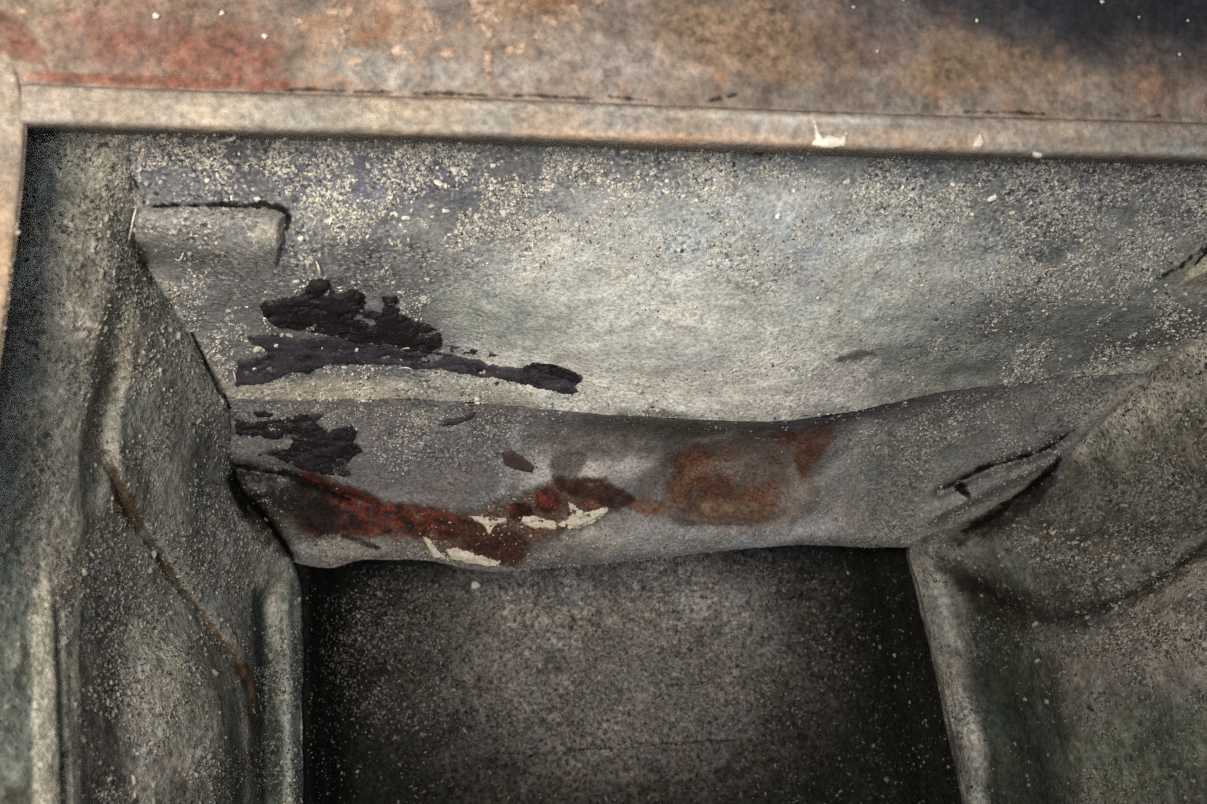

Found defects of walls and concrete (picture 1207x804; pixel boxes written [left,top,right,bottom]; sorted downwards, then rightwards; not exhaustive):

crack [130,175,291,230]
crack [1157,247,1207,279]
peeling [235,278,582,395]
peeling [233,411,363,477]
peeling [443,411,476,426]
peeling [502,450,534,473]
peeling [469,502,608,534]
rust [294,423,835,565]
crack [944,433,1069,533]
peeling [423,537,500,567]
rust [103,452,259,804]